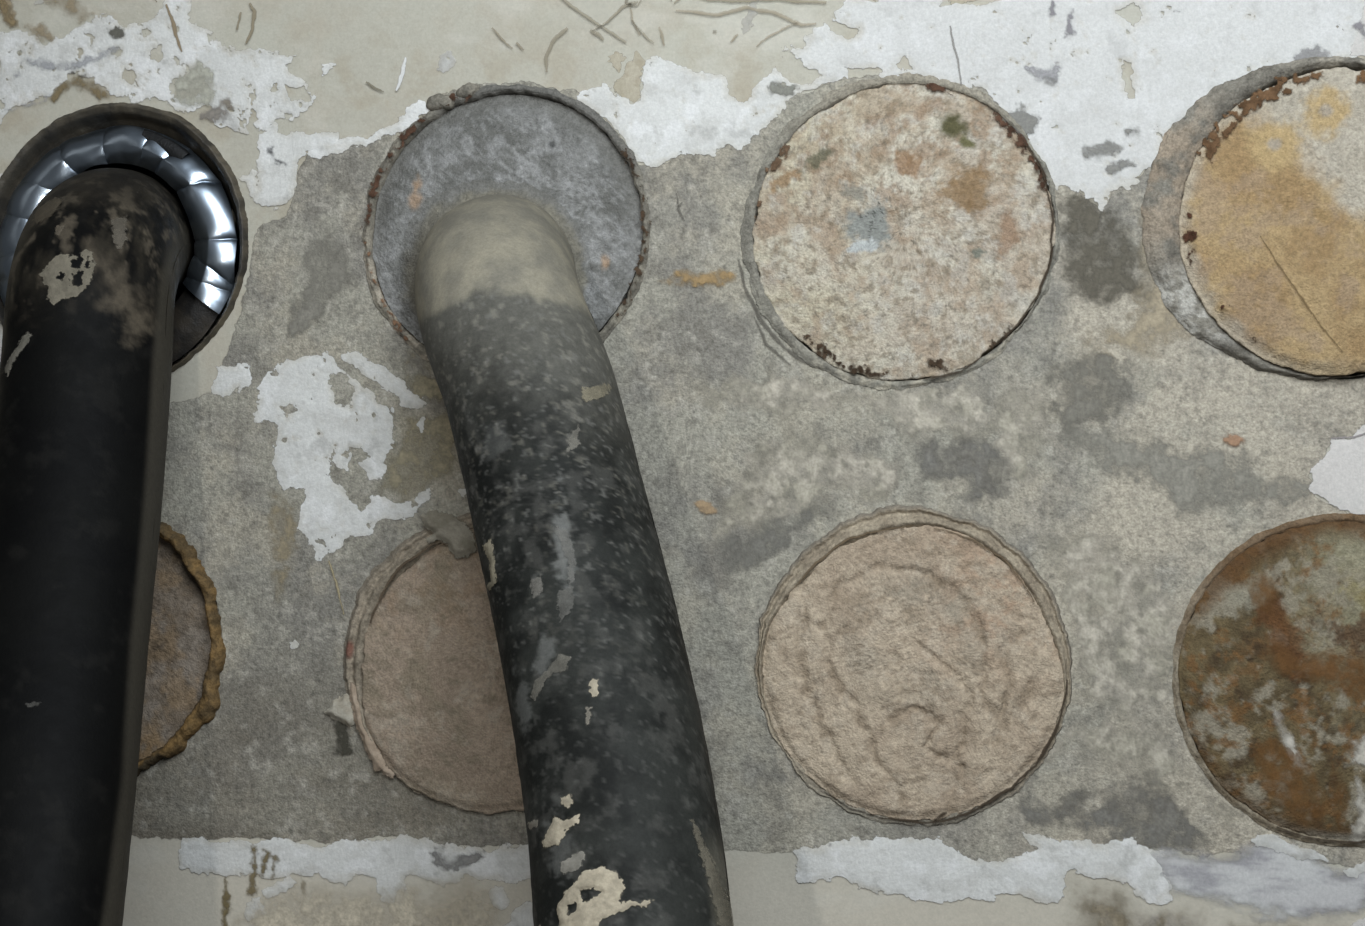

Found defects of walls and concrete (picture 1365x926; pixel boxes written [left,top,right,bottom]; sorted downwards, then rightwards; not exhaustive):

crack [155,0,182,52]
crack [544,0,827,72]
rust [1196,71,1323,163]
rust [1182,213,1197,264]
flaking render [0,0,534,926]
flaking render [477,0,1365,926]
leakage [1083,899,1185,926]